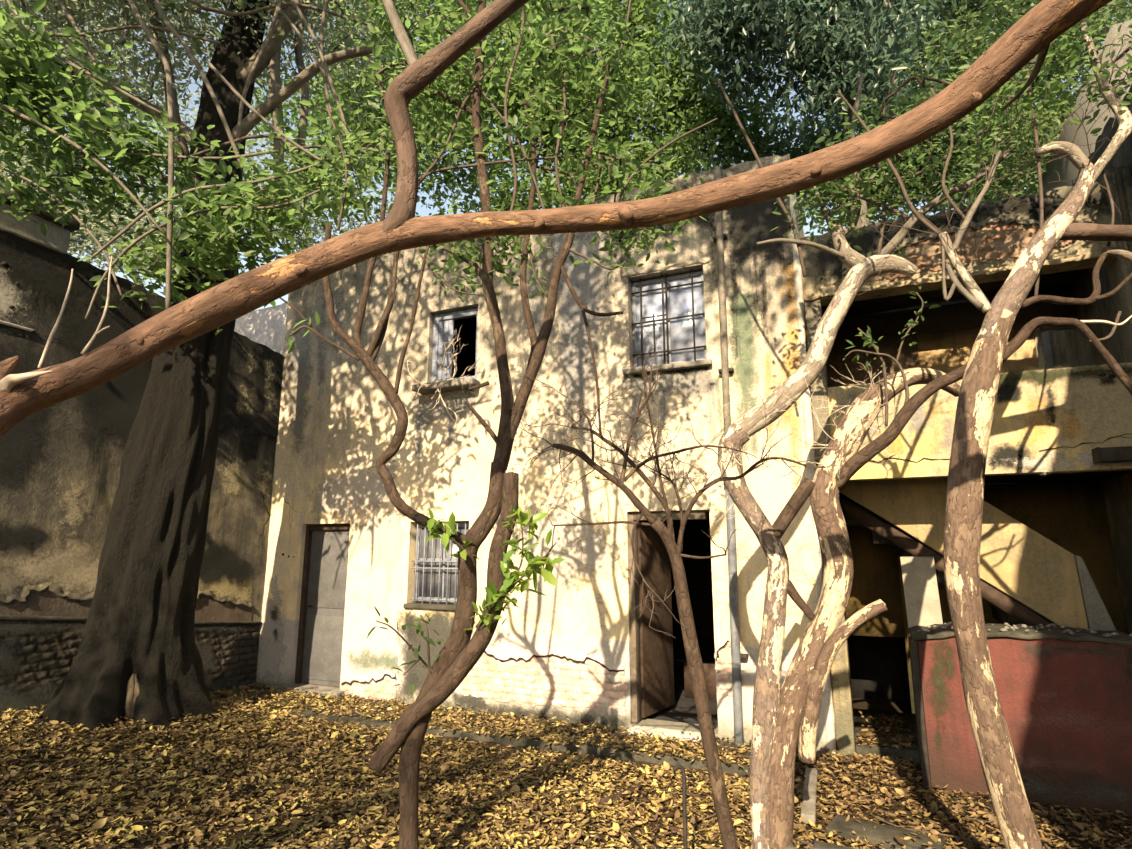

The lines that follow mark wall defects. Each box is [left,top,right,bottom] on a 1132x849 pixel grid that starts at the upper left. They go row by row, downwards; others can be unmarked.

damp [0,339,42,374]
damp [552,195,793,475]
damp [997,365,1132,423]
damp [986,444,1101,471]
crack [1040,434,1132,451]
damp [0,520,51,554]
flaking render [0,484,100,622]
peeling [513,503,616,634]
flaking render [195,575,253,622]
flaking render [341,669,397,702]
flaking render [459,646,629,710]